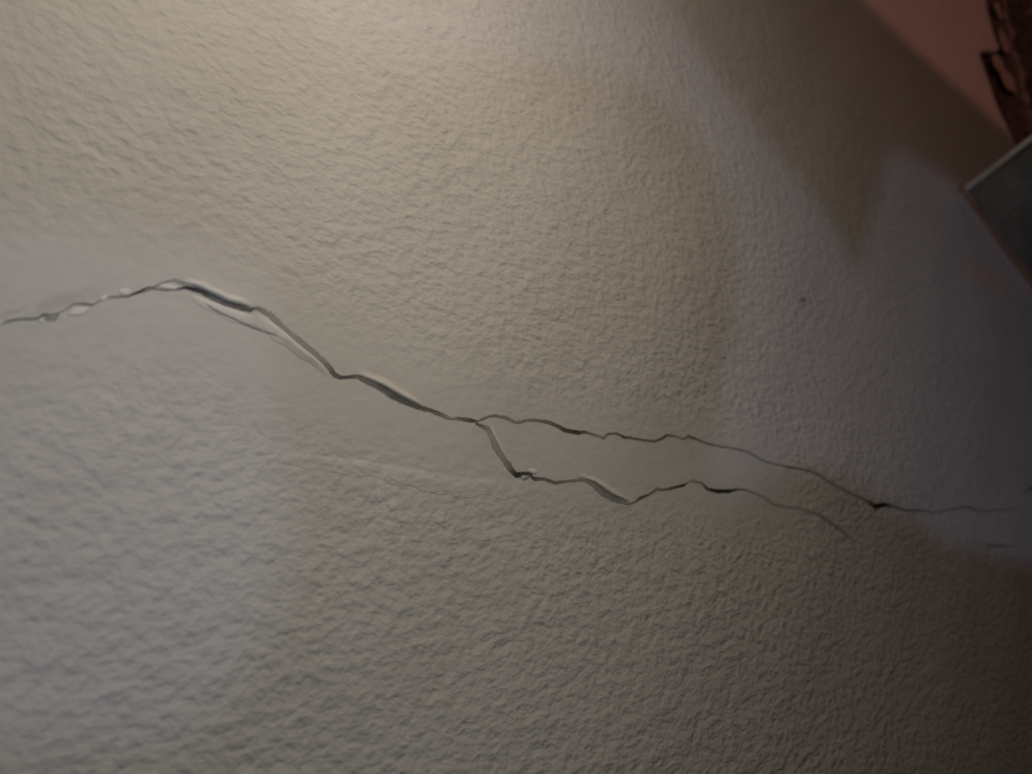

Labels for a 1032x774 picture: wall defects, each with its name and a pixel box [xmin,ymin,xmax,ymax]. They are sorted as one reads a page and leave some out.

crack [0,266,1032,541]